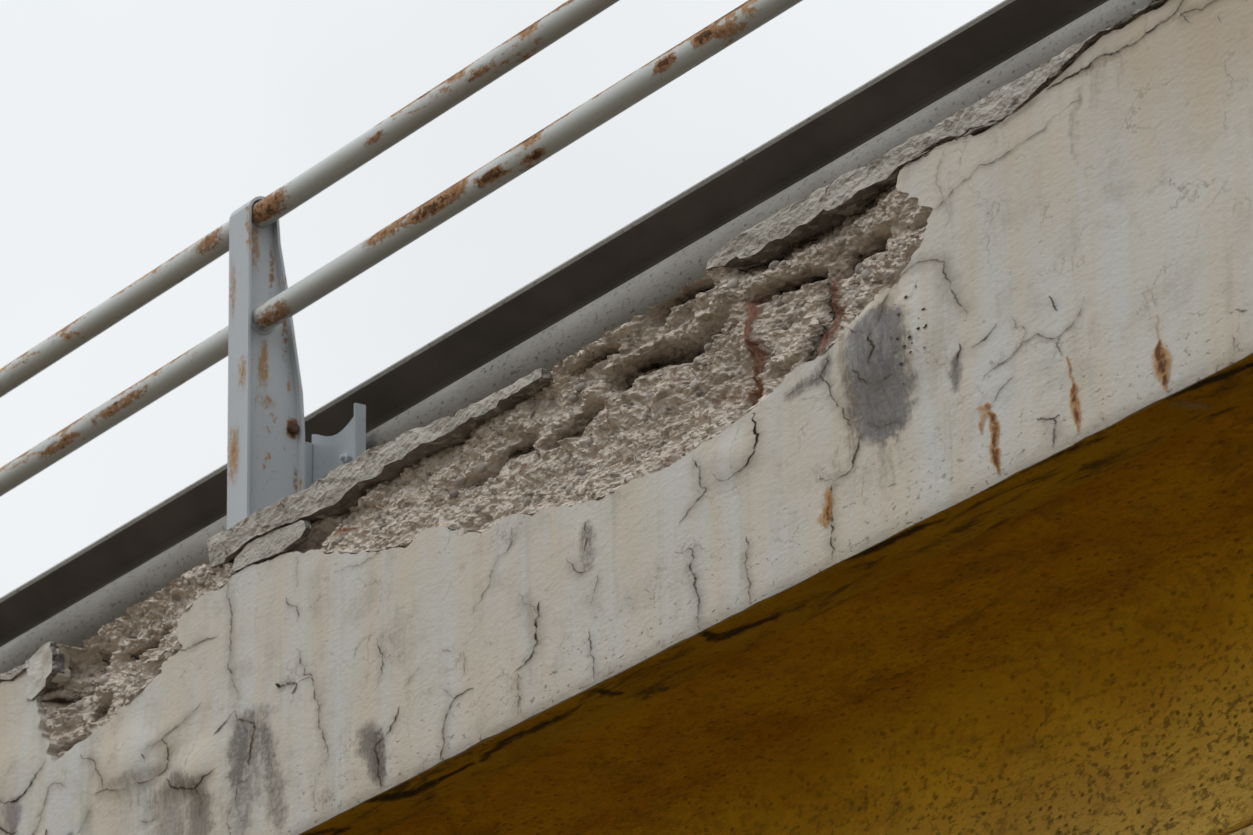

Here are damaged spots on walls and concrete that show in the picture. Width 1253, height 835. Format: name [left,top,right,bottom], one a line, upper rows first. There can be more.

rust [690,23,717,48]
crack [896,0,1220,230]
rust [252,187,285,287]
rust [366,164,506,246]
spalling [25,183,933,759]
crack [679,413,759,629]
water stain [842,304,915,445]
crack [791,259,967,553]
rust [976,402,1000,474]
crack [956,296,1084,402]
rust [1152,325,1170,391]
crack [0,502,304,835]